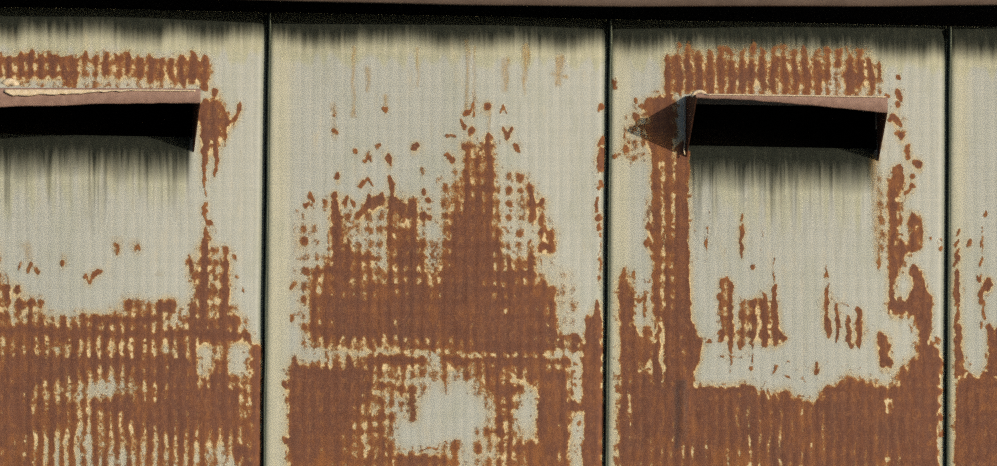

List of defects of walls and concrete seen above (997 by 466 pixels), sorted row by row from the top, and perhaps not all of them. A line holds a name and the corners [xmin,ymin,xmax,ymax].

corrosion [0,49,263,466]
corrosion [282,42,997,466]